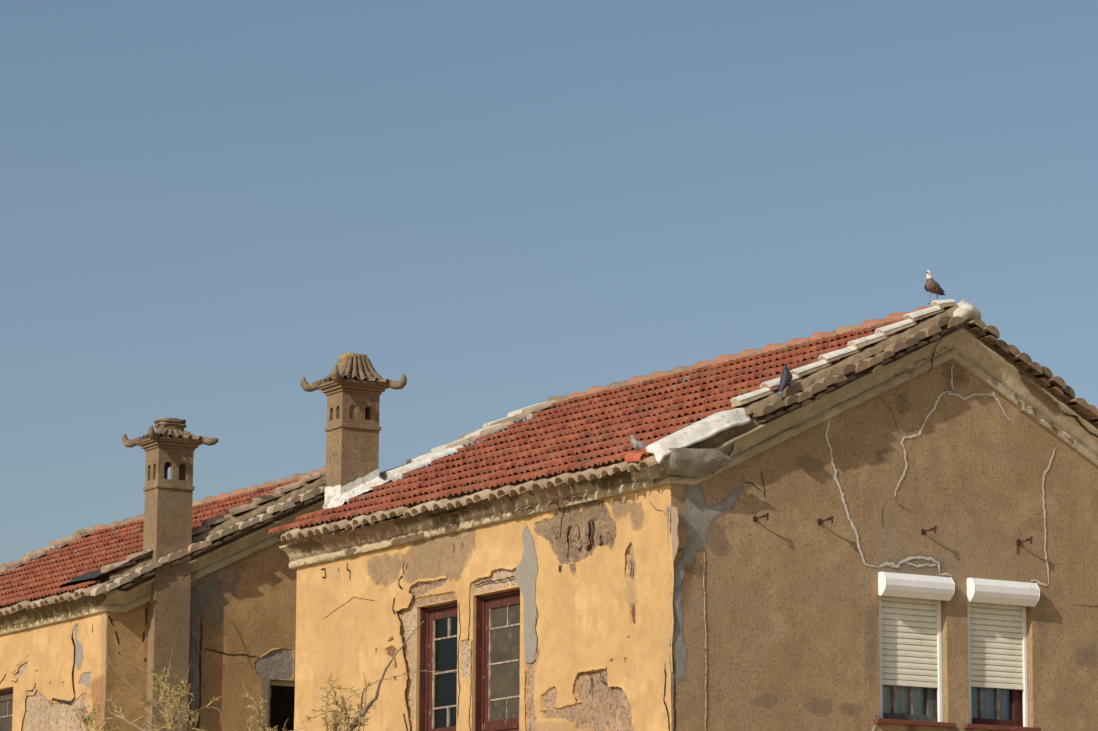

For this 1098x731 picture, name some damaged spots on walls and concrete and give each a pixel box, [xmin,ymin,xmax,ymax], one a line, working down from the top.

crack [825,337,1098,586]
flaking render [293,481,649,580]
peeling [666,505,679,561]
spalling [0,655,93,731]
crack [49,607,147,707]
crack [189,618,256,731]
spalling [524,651,634,731]